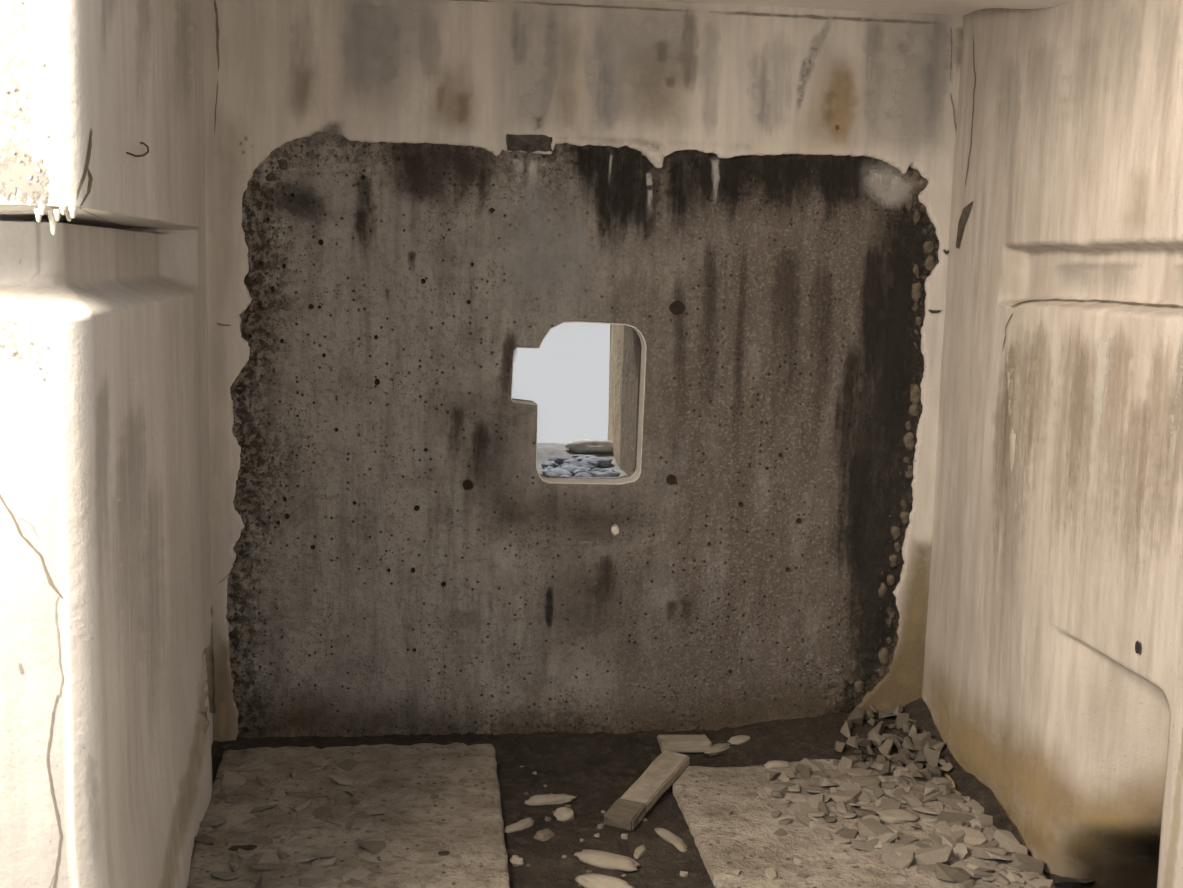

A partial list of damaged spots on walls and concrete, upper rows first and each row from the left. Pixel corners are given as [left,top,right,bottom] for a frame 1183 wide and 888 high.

peeling [0,0,55,205]
damp [357,180,371,231]
damp [395,142,488,198]
damp [513,159,545,191]
damp [572,144,656,234]
damp [502,336,516,392]
spalling [226,132,939,739]
damp [670,150,936,713]
damp [1064,339,1123,446]
crack [0,495,64,888]